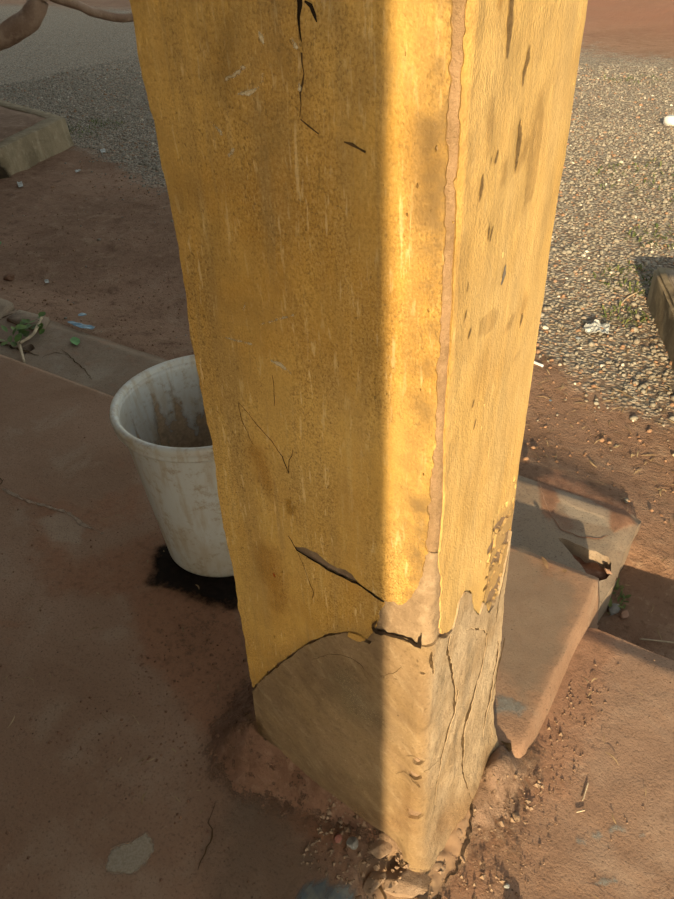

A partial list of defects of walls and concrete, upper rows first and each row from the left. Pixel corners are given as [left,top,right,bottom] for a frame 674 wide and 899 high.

crack [297,0,319,134]
crack [344,141,366,153]
crack [288,536,384,603]
spalling [348,551,441,649]
crack [398,521,512,899]